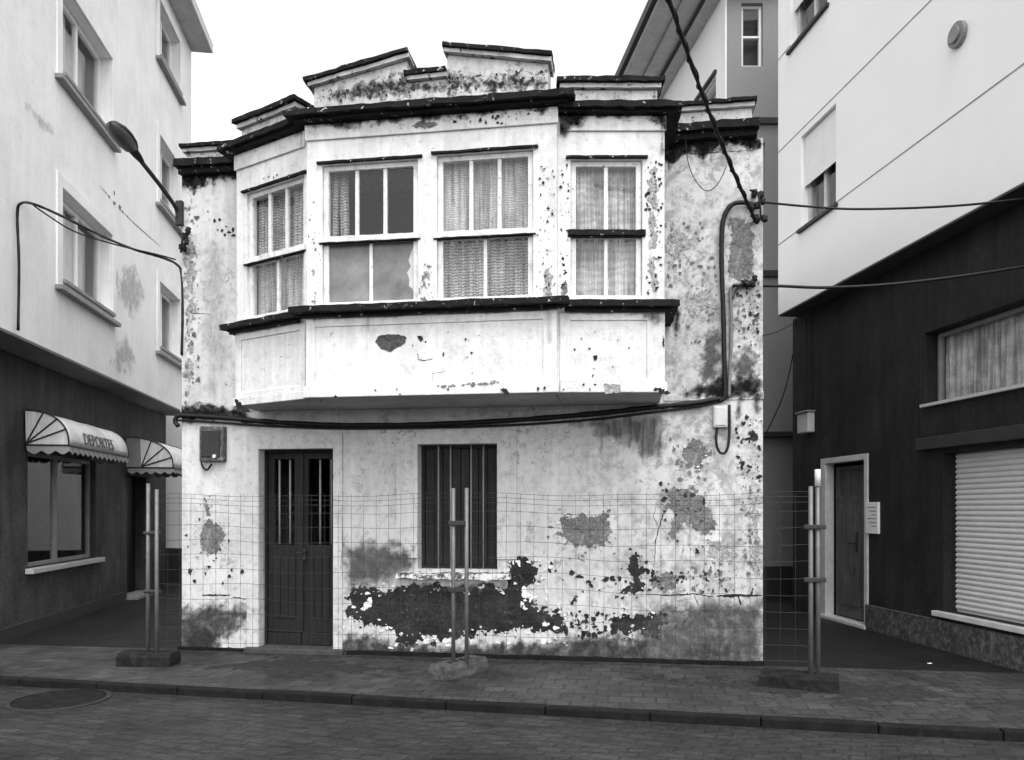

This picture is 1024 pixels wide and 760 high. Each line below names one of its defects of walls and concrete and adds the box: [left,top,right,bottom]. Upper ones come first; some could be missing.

leakage [651,115,667,130]
leakage [661,138,762,169]
leakage [182,173,237,195]
peeling [644,161,761,350]
spalling [375,334,426,352]
leakage [683,335,762,414]
peeling [185,496,229,583]
peeling [342,415,763,651]
leakage [344,540,415,589]
leakage [182,605,247,647]